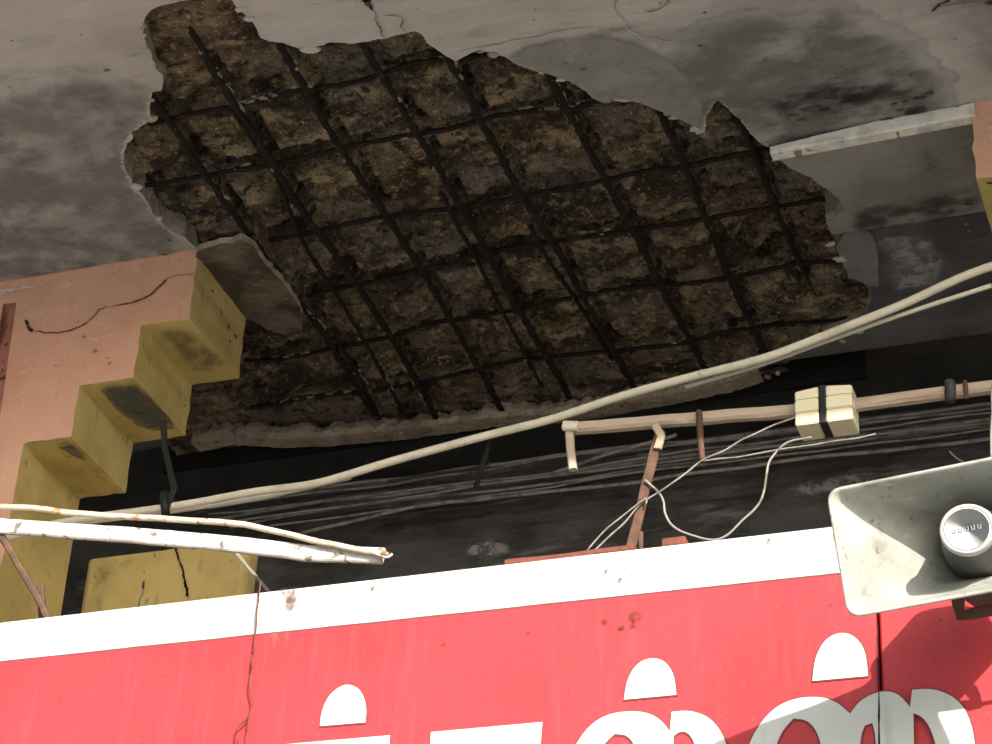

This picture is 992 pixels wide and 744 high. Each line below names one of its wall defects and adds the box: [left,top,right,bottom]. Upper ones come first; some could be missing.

crack [360,0,406,38]
water stain [680,23,937,143]
water stain [0,85,171,279]
spalling [121,0,880,474]
crack [24,274,192,334]
crack [175,548,189,597]